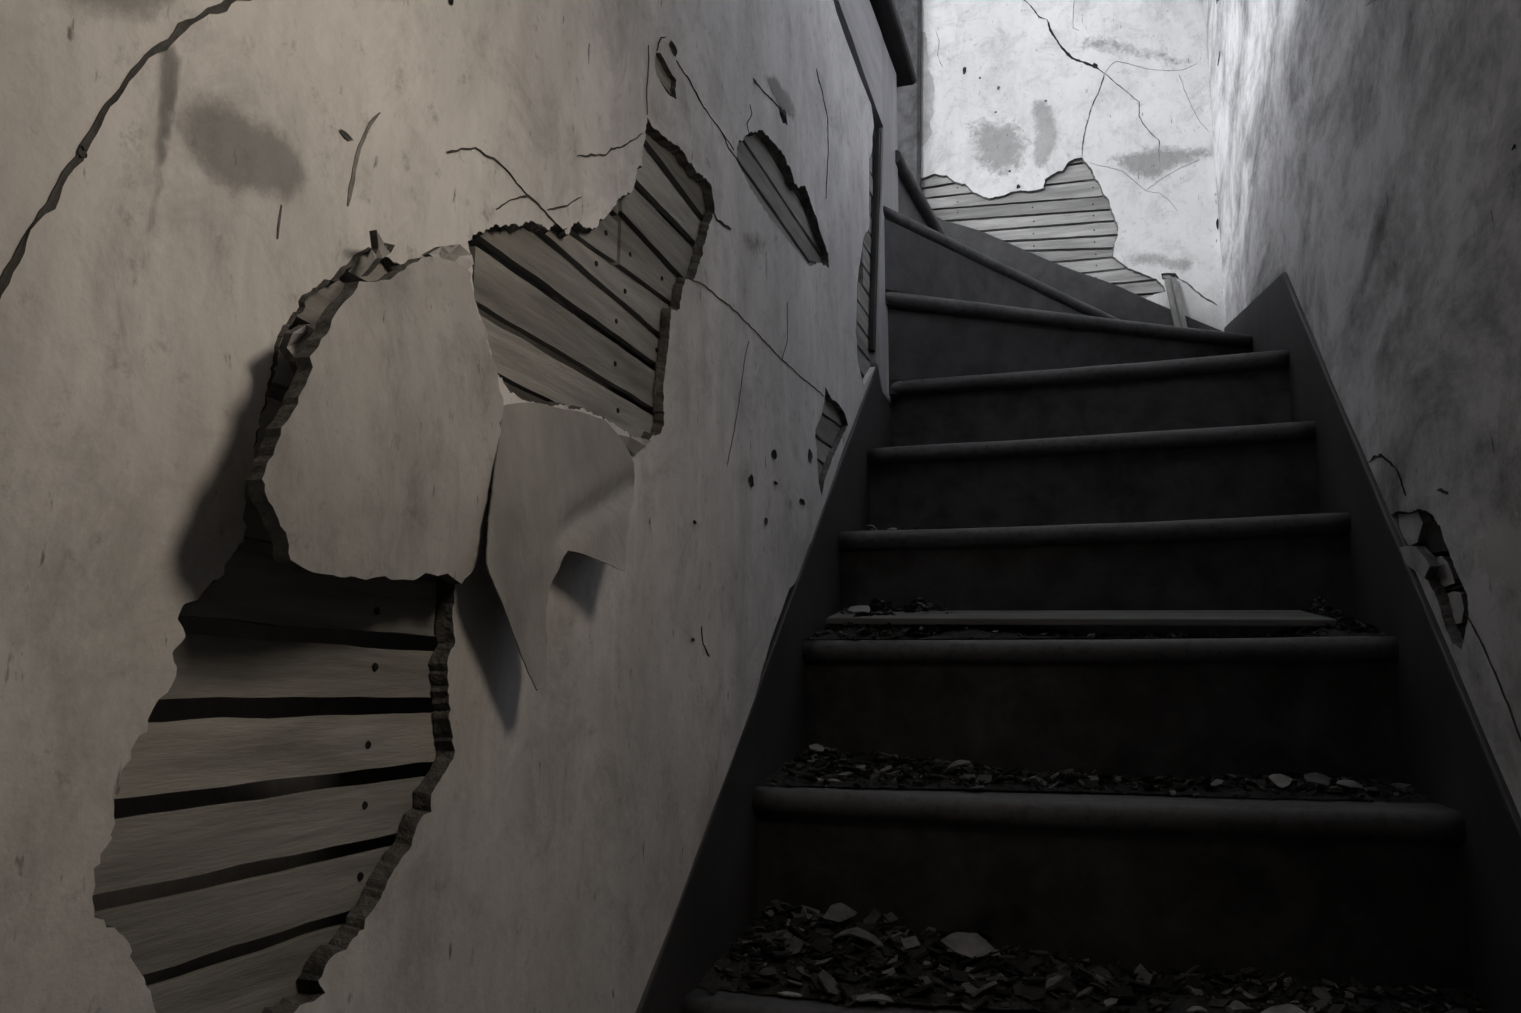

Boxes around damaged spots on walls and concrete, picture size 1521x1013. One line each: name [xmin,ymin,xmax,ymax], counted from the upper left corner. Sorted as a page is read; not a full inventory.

crack [0,0,251,299]
crack [347,112,380,206]
crack [447,147,581,230]
spalling [469,117,715,440]
crack [578,37,780,158]
spalling [736,130,829,267]
leakage [975,102,1055,175]
spalling [921,158,1179,298]
crack [1024,0,1210,209]
spalling [254,247,400,458]
spalling [799,387,848,505]
spalling [93,482,455,1013]